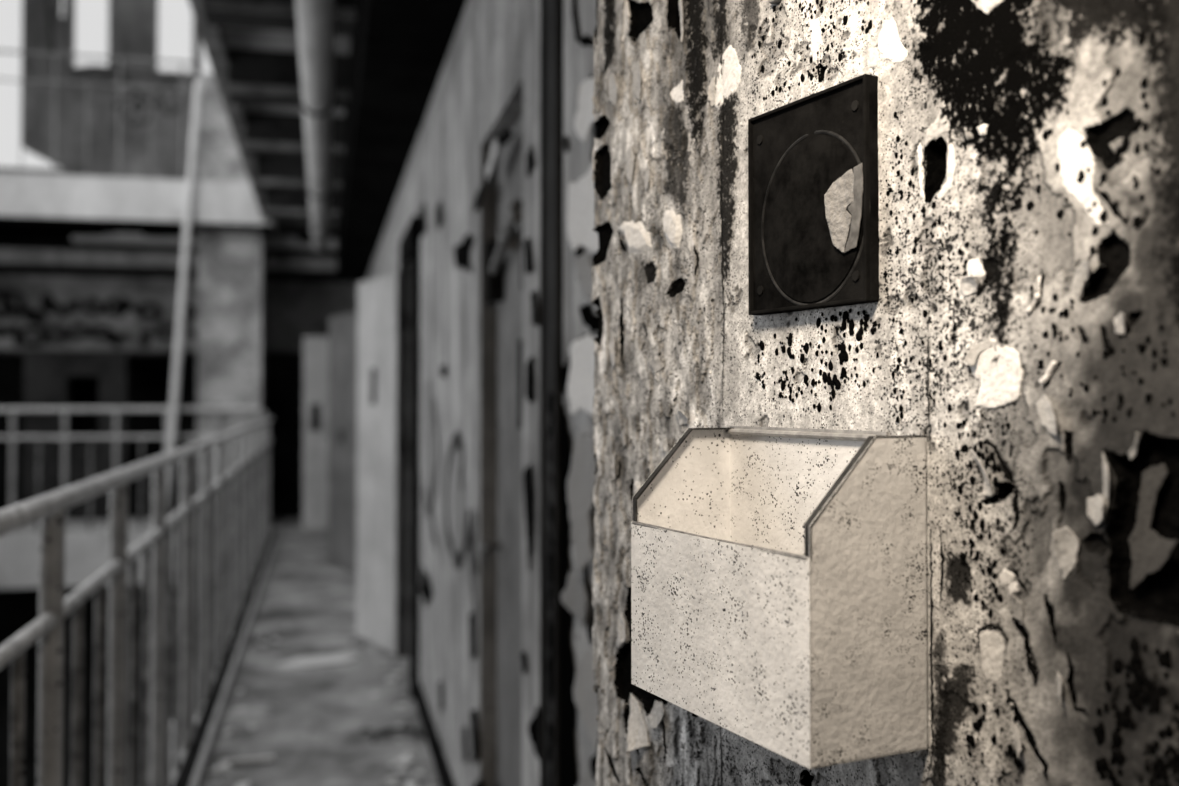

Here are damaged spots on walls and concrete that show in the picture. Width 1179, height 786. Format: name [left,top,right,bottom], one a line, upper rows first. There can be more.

peeling [571,0,598,46]
spalling [523,238,533,274]
spalling [917,100,956,204]
water stain [755,0,1179,423]
peeling [965,124,988,140]
spalling [1058,107,1135,303]
peeling [525,73,641,786]
peeling [1036,395,1073,460]
spalling [523,464,534,572]
water stain [918,389,1013,617]
spalling [1052,430,1179,628]